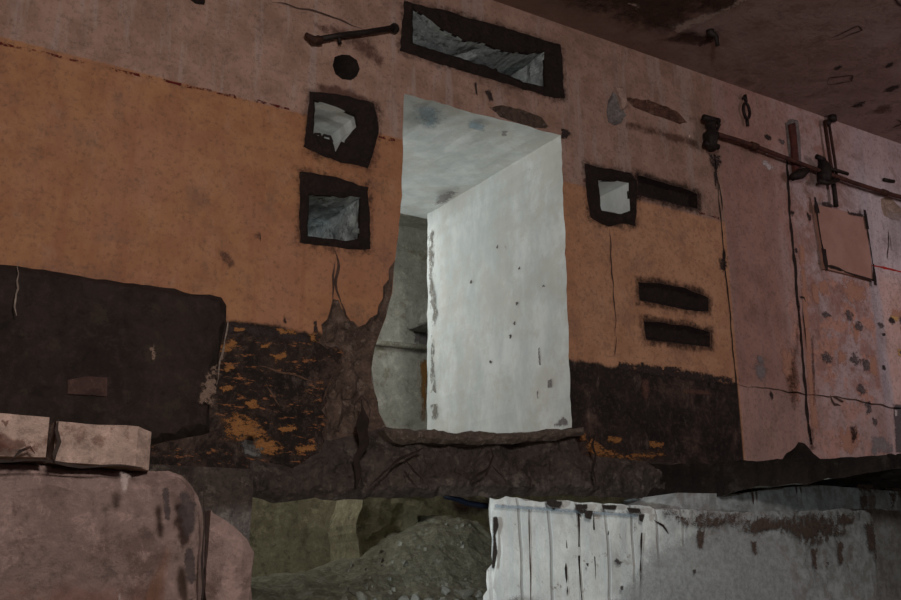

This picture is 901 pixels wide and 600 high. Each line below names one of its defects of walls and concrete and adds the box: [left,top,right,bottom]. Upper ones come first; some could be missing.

damp [579,0,737,44]
peeling [428,231,438,324]
flaking render [220,261,395,457]
corrosion [419,360,428,420]
damp [617,362,733,389]
peeling [580,433,666,461]
damp [696,528,705,550]